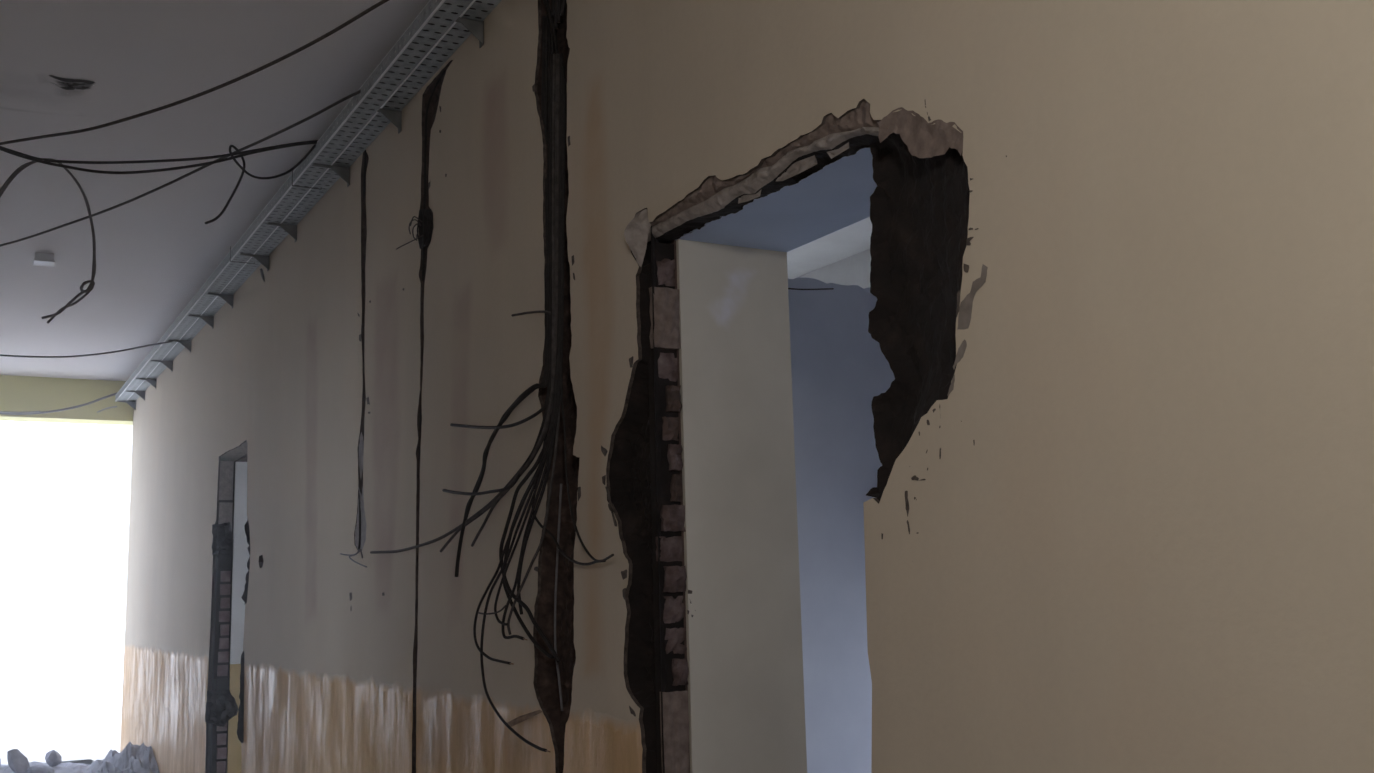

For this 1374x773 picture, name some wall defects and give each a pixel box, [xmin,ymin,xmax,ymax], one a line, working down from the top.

flaking render [205,442,264,773]
flaking render [601,100,988,773]